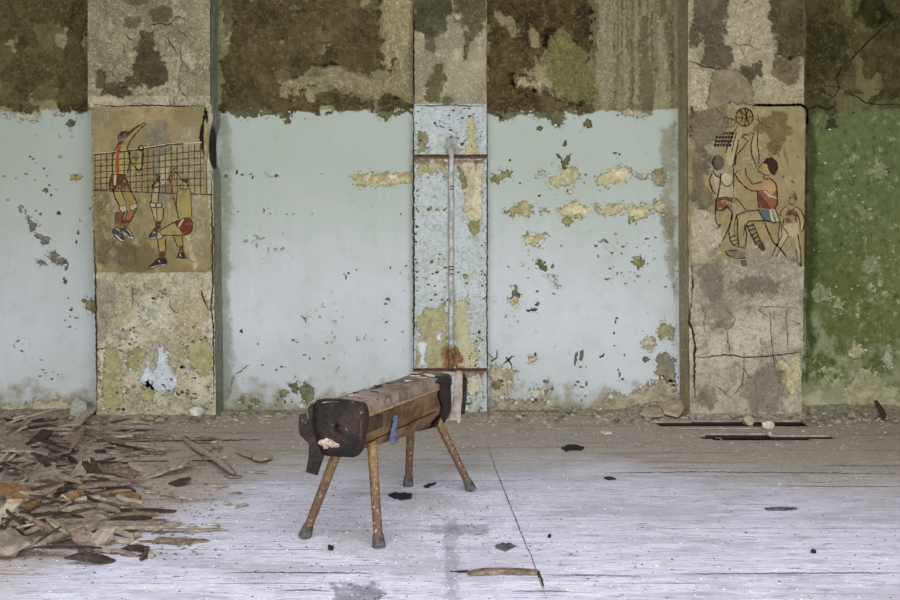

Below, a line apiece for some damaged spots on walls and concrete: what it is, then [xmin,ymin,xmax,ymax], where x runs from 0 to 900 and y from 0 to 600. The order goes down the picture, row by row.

crack [96,16,206,107]
crack [808,15,900,110]
peeling [231,105,292,125]
peeling [6,199,69,284]
peeling [348,105,571,246]
water stain [179,0,900,414]
peeling [502,140,670,227]
peeling [0,395,72,410]
peeling [86,288,216,411]
rust [441,344,484,377]
peeling [403,253,680,412]
crack [687,266,802,398]